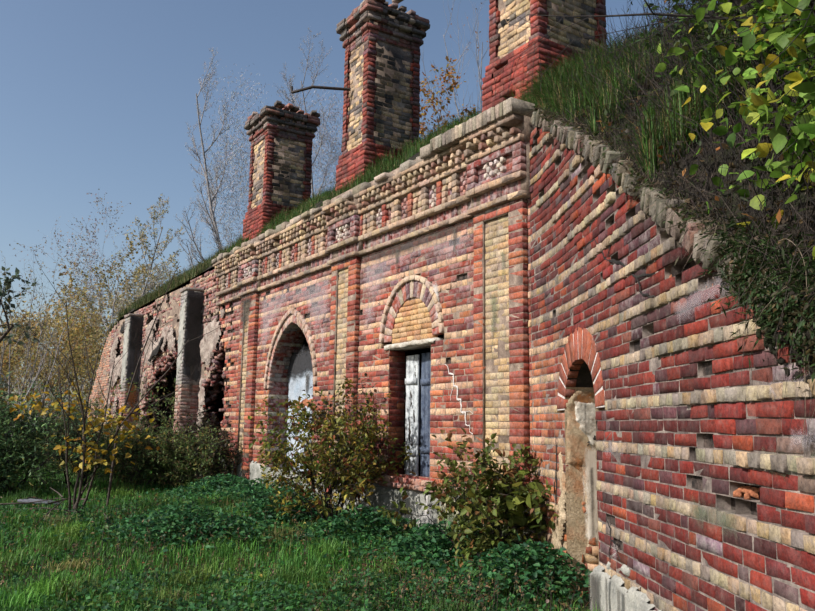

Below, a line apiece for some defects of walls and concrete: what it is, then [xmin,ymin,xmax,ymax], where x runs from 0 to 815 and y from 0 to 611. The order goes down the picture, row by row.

flaking render [105,324,125,423]
spalling [140,316,178,436]
spalling [196,309,230,447]
crack [445,364,473,434]